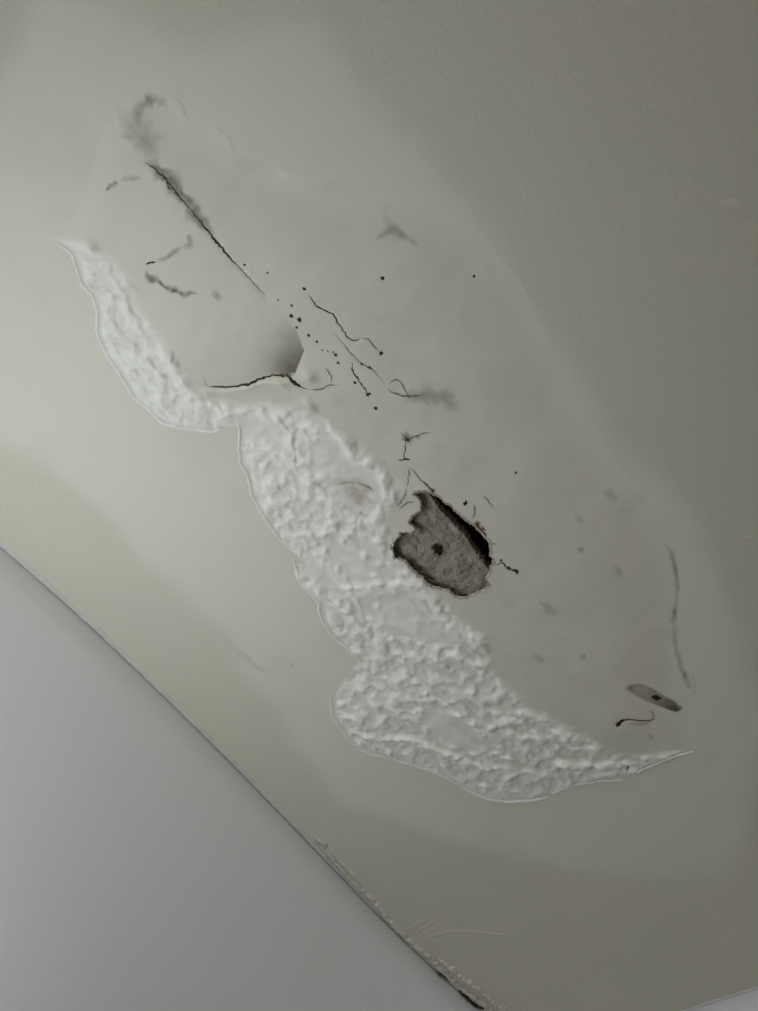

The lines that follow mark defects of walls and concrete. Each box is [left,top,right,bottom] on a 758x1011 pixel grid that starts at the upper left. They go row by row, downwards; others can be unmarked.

crack [144,162,264,293]
crack [209,287,421,410]
flaking render [49,237,694,804]
flaking render [313,835,507,1011]